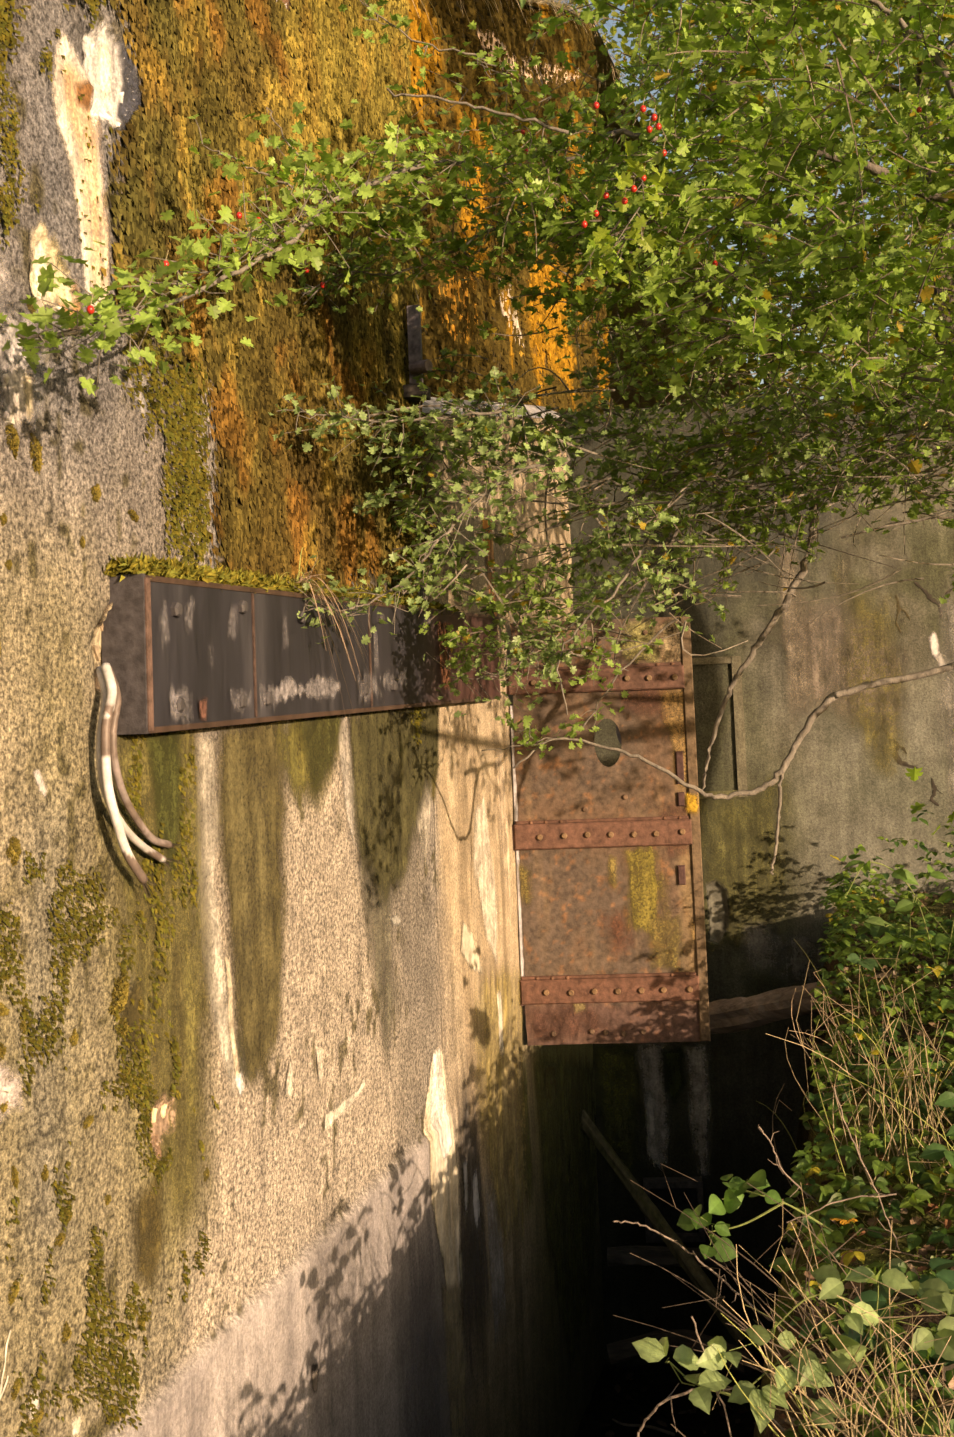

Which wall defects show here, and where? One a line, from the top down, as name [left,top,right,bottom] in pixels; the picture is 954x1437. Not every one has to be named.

spalling [82,22,143,130]
leakage [780,551,899,715]
corrosion [199,699,207,719]
leakage [930,602,954,791]
leakage [416,770,437,865]
leakage [147,731,252,1094]
leakage [301,715,401,1047]
leakage [745,926,822,984]
leakage [286,1062,294,1098]
leakage [641,1045,709,1175]
leakage [135,1182,162,1285]
leakage [72,1417,81,1435]